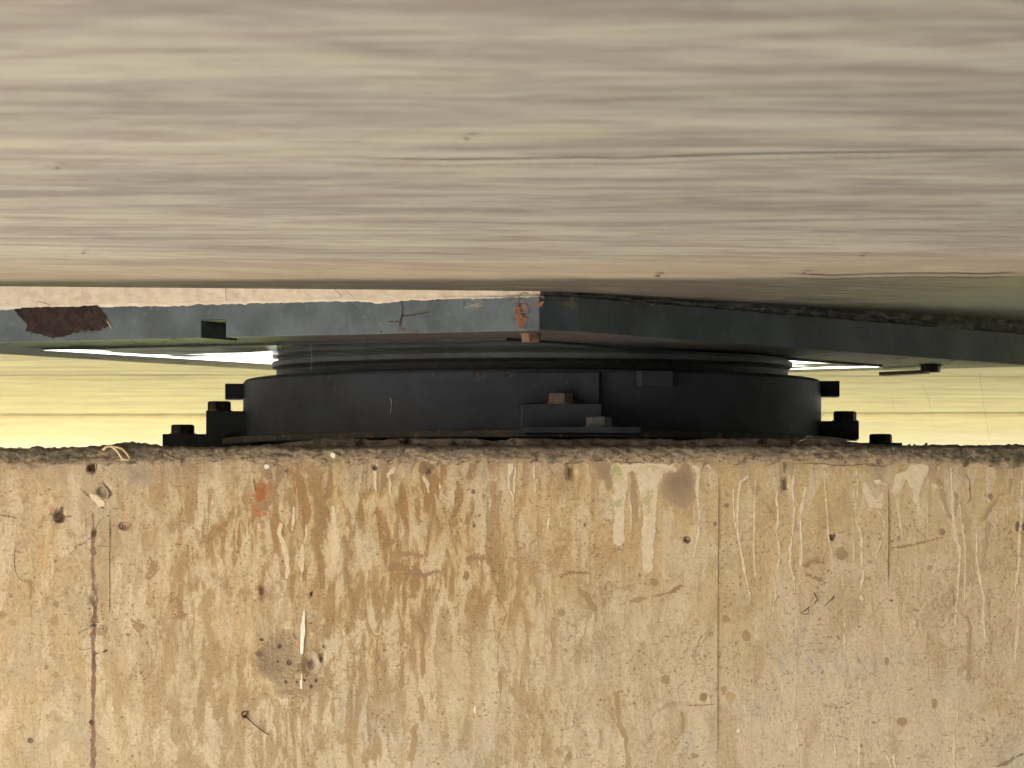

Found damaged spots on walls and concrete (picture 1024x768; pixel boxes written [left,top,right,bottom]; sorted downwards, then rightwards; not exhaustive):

crack [389,300,427,327]
leakage [119,463,161,492]
leakage [145,557,159,580]
corrosion [252,477,271,520]
leakage [255,520,272,601]
leakage [277,468,386,640]
leakage [373,467,441,687]
leakage [592,461,712,573]
leakage [732,469,834,623]
leakage [855,463,1024,680]
leakage [173,590,220,719]
leakage [614,692,630,768]